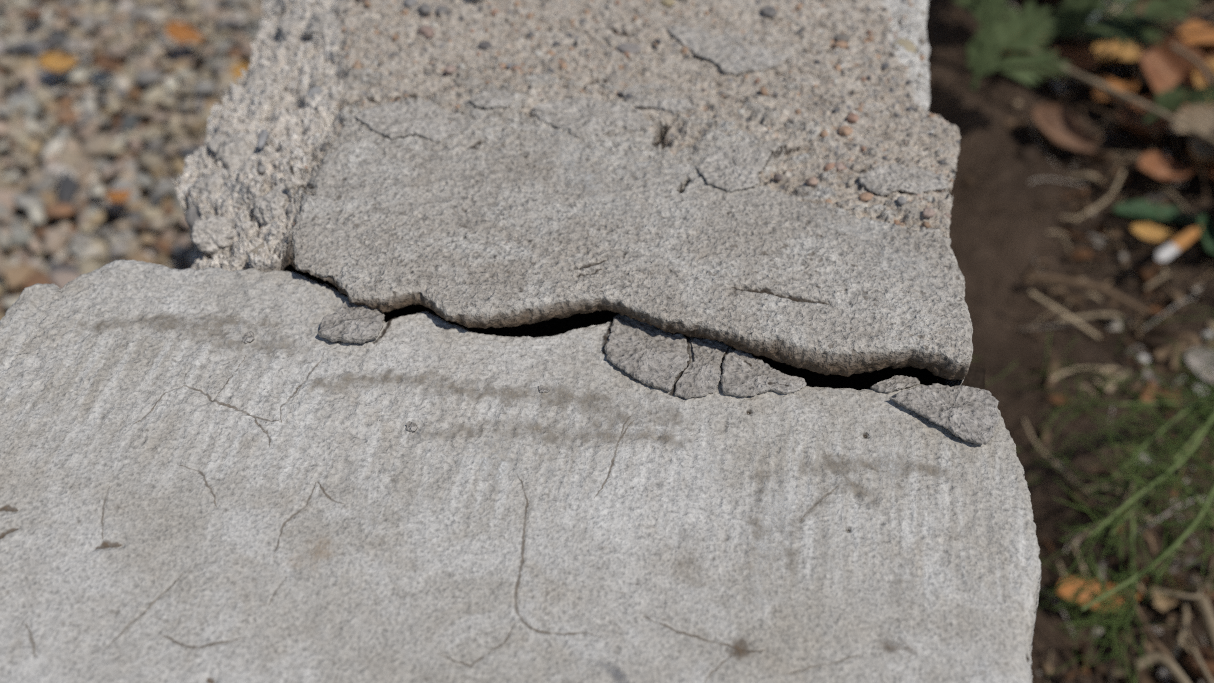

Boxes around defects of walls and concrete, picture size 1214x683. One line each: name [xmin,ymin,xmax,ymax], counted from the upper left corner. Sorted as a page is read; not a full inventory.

spalling [340,0,960,228]
crack [299,271,348,297]
spalling [318,301,385,344]
crack [373,304,620,354]
crack [669,332,691,396]
crack [720,346,986,390]
crack [451,475,600,667]